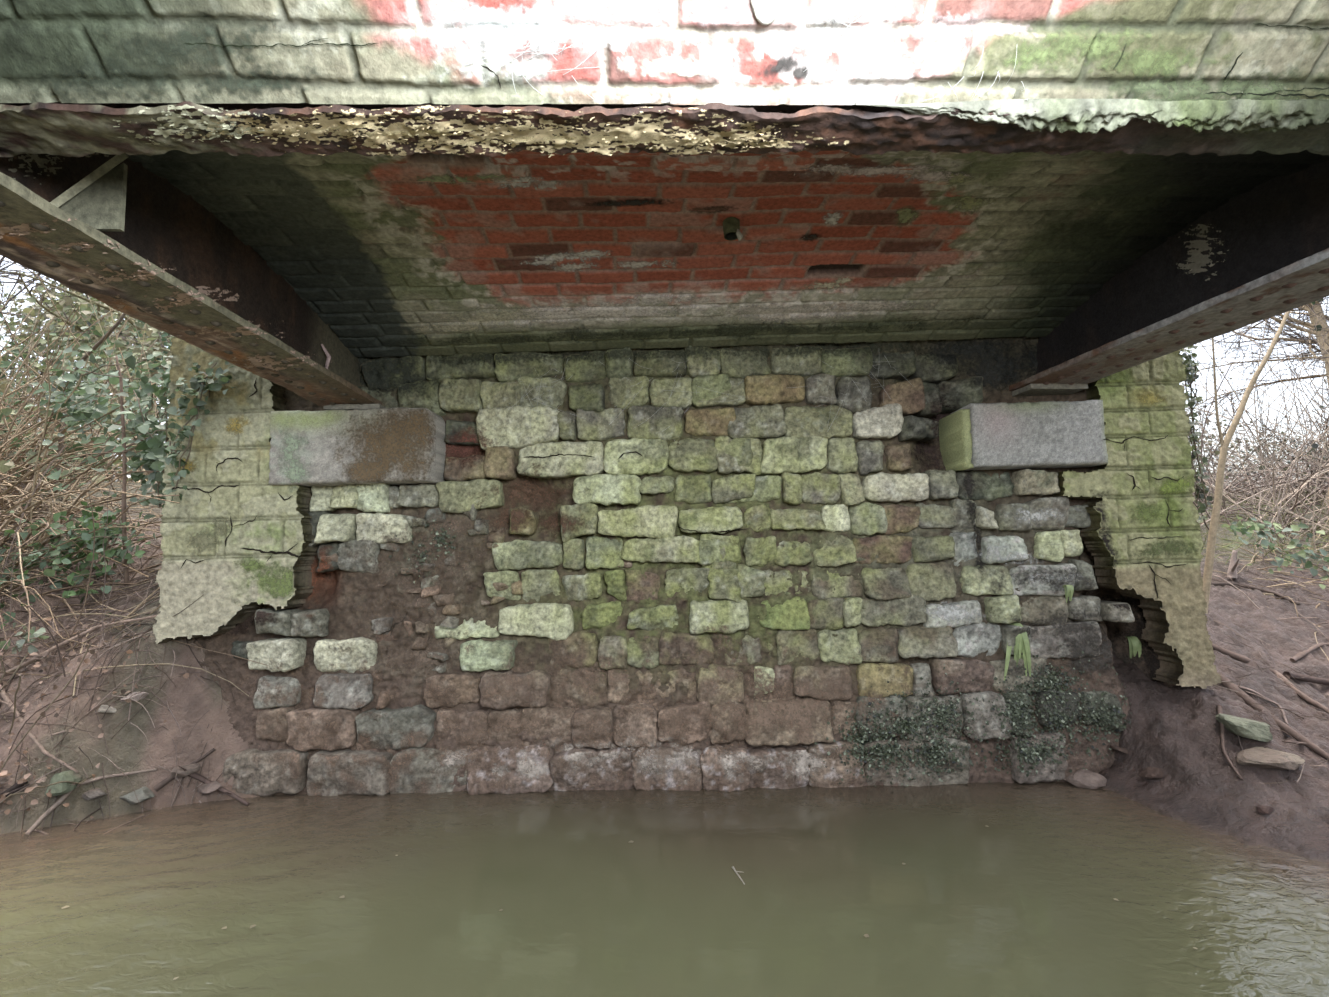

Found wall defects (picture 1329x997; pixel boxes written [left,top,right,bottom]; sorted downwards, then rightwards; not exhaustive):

peeling [113,104,849,157]
spalling [588,198,670,207]
spalling [478,464,583,537]
spalling [1102,595,1161,682]